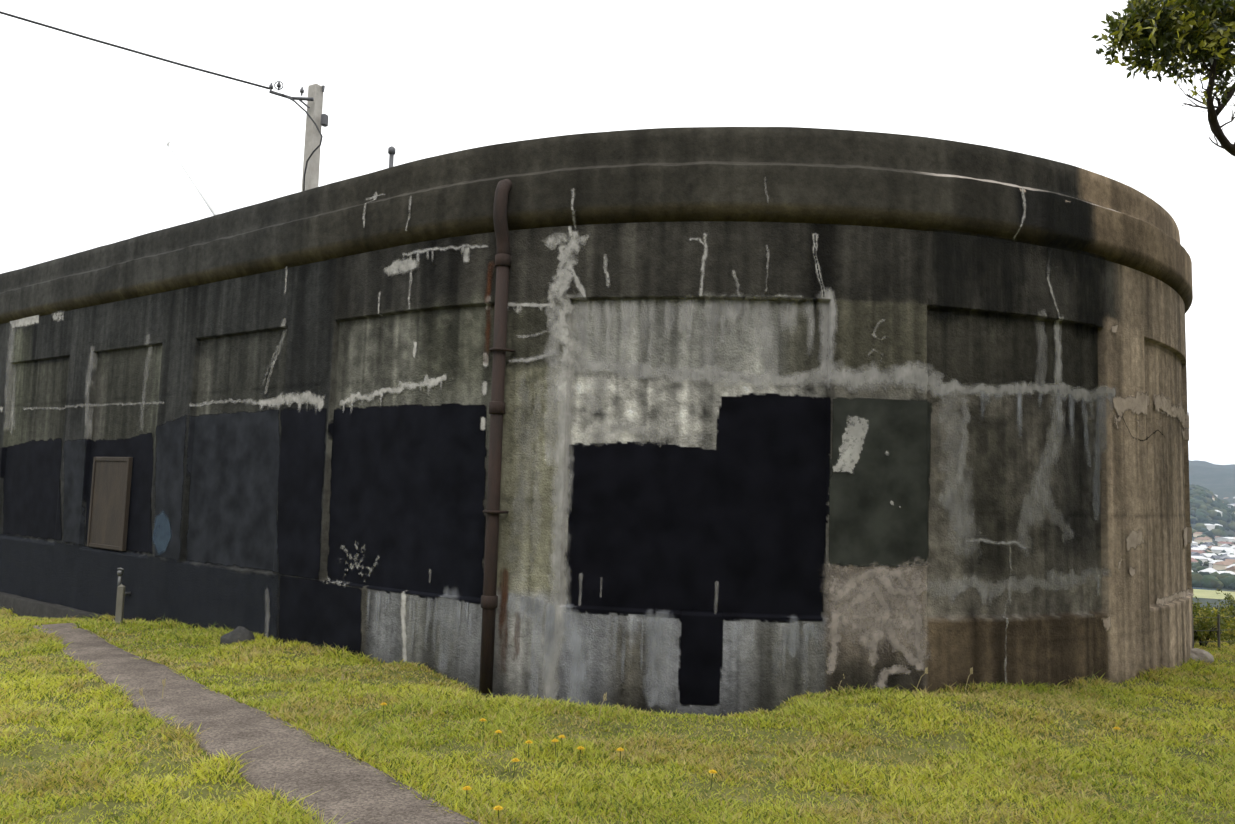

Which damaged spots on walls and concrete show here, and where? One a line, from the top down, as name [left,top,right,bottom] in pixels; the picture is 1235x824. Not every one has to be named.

damp [386,245,488,274]
damp [247,392,324,410]
damp [340,375,446,408]
damp [508,227,1116,704]